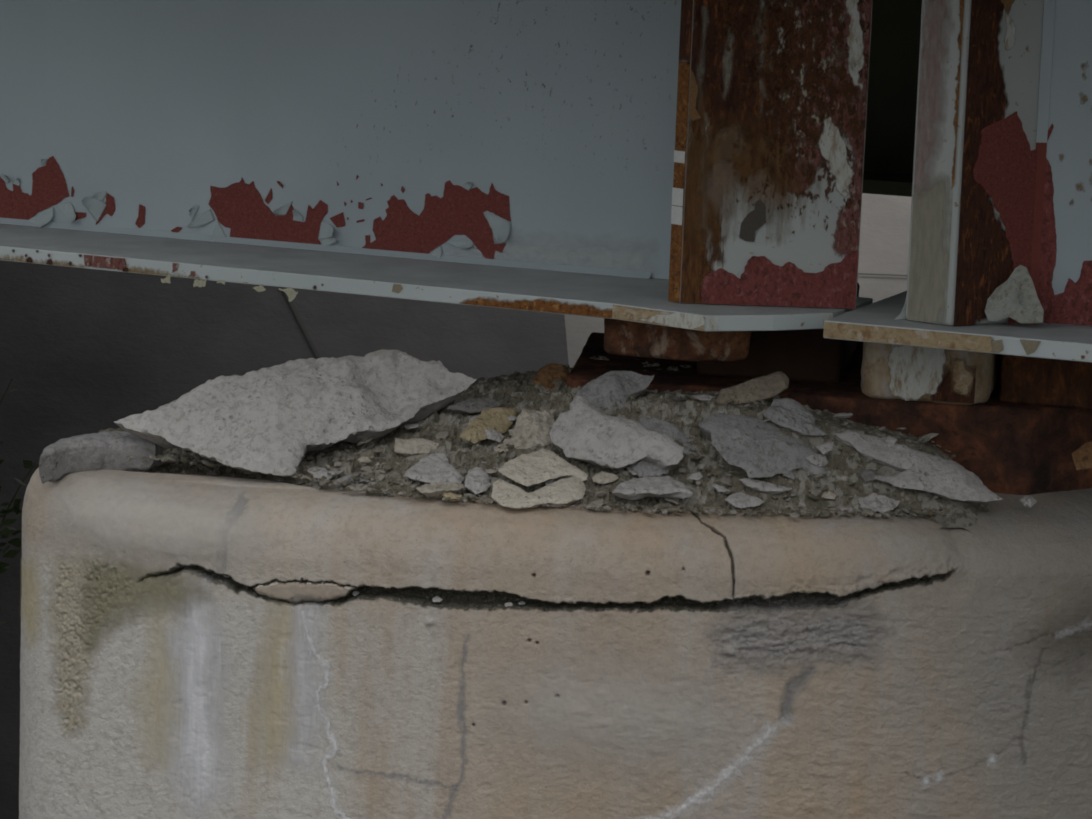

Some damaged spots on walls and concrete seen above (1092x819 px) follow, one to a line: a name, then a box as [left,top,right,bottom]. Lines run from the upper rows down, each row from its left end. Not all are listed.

peeling [0,156,115,227]
peeling [171,178,511,259]
corrosion [668,0,800,304]
corrosion [952,0,1016,326]
peeling [973,111,1092,326]
corrosion [460,298,612,318]
corrosion [932,360,976,404]
corrosion [1072,441,1092,470]
crack [143,498,954,613]
damp [87,568,217,800]